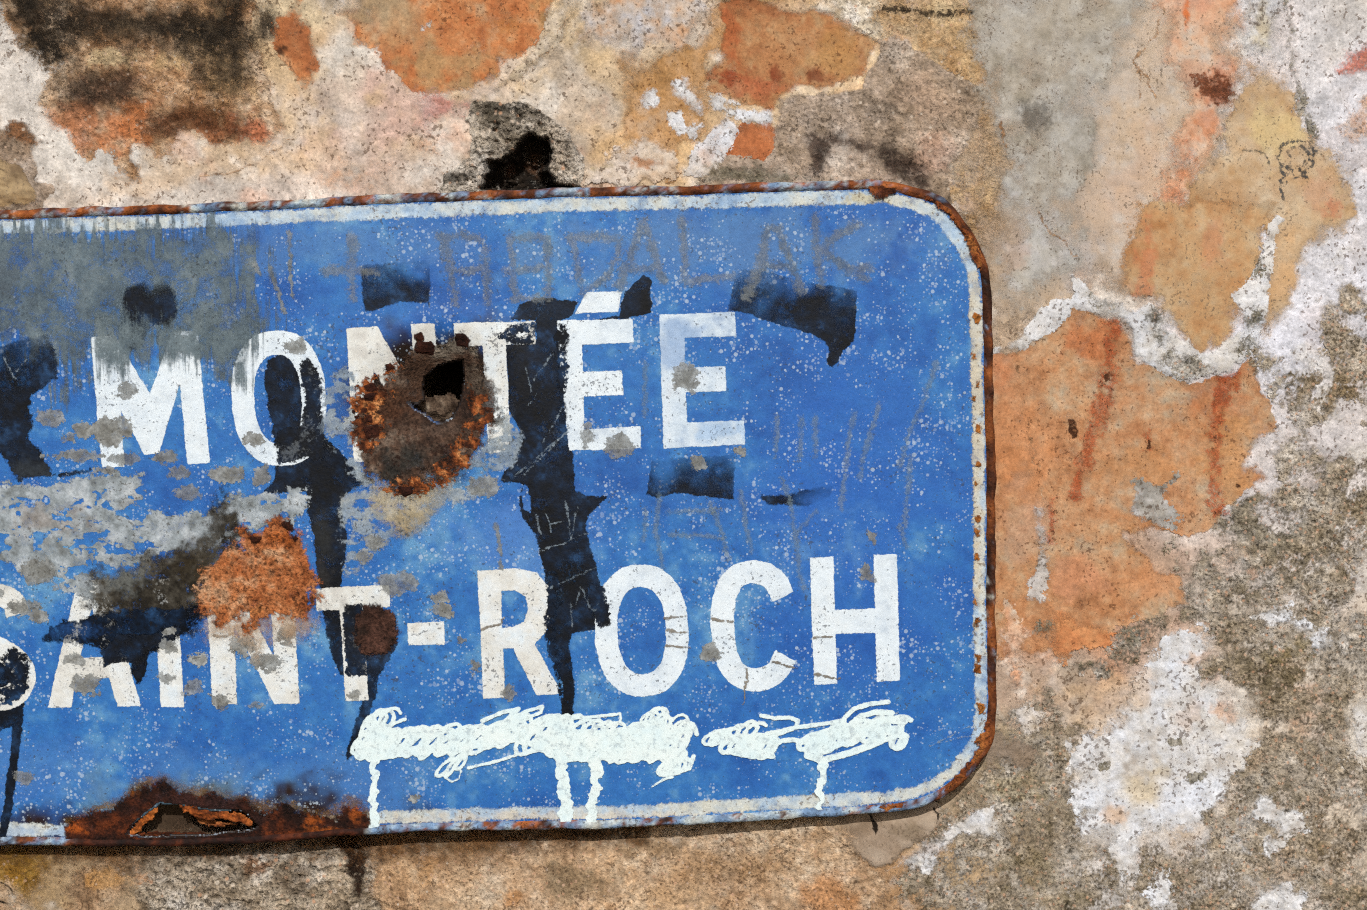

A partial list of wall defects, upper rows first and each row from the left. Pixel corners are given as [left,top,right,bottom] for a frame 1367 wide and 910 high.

spalling [0,120,55,210]
water stain [3,0,277,107]
spalling [0,0,320,185]
water stain [149,108,242,136]
peeling [325,0,553,121]
peeling [483,0,1357,684]
peeling [1352,699,1367,757]
peeling [0,879,26,910]
peeling [68,802,997,910]
peeling [1248,878,1308,910]
peeling [1252,795,1311,859]